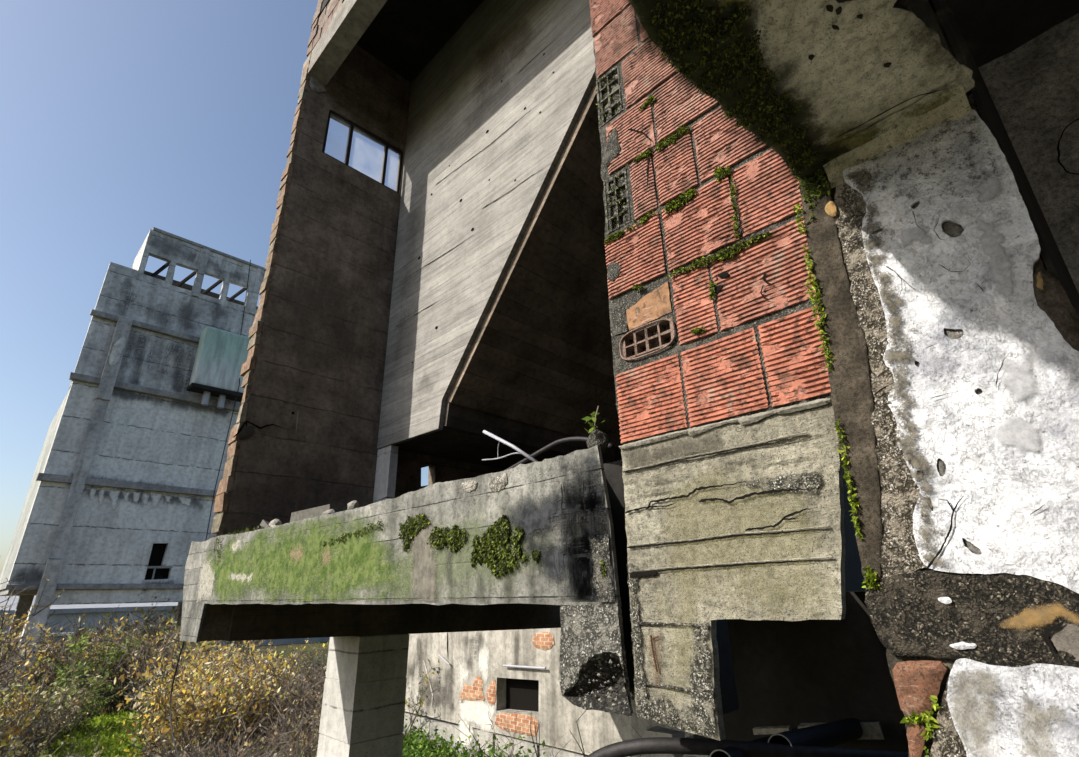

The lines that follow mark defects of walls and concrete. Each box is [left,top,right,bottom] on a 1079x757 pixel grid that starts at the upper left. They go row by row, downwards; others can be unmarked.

spalling [238,426,255,440]
crack [234,420,289,437]
damp [84,477,198,509]
damp [507,456,609,600]
crack [625,481,817,531]
crack [927,497,963,570]
spalling [563,564,716,738]
flaking render [865,570,1079,757]
flaking render [460,676,538,736]